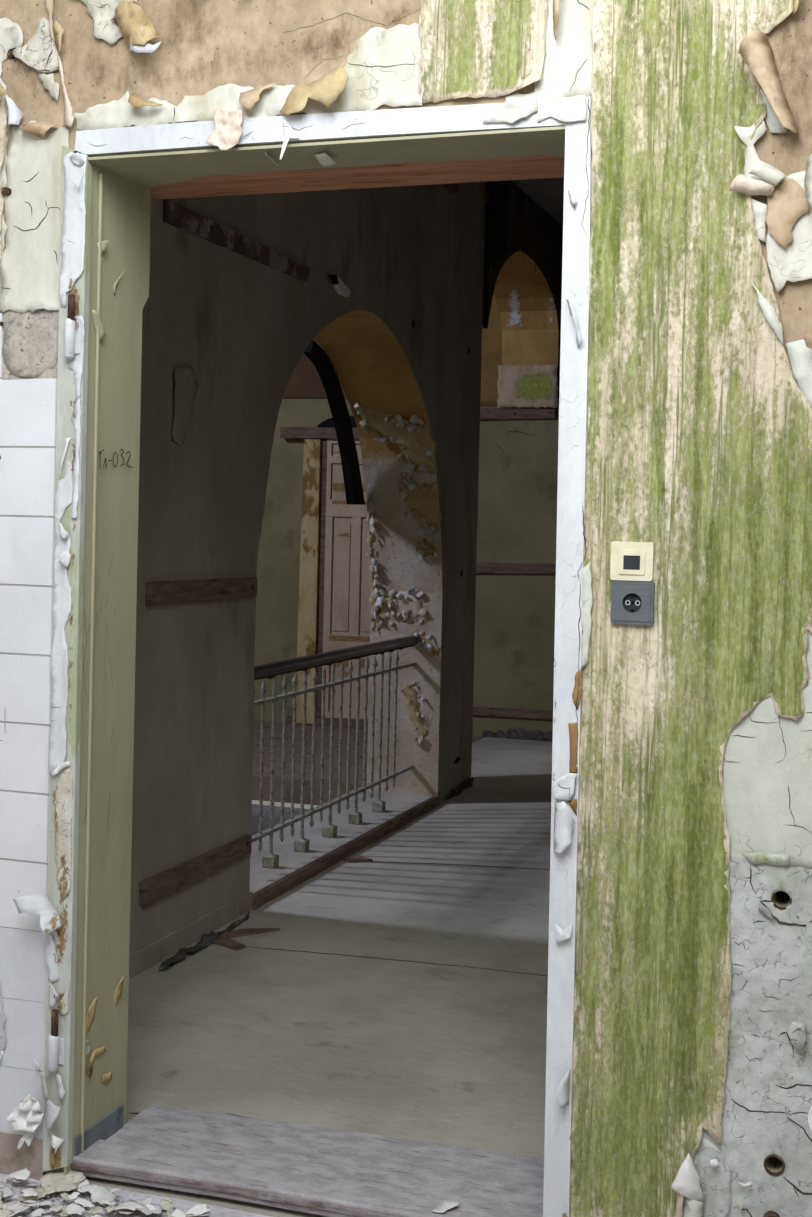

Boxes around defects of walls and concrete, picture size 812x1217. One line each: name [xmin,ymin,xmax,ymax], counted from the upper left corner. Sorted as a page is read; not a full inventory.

peeling [81,0,161,53]
peeling [482,0,594,124]
crack [15,172,61,259]
leakage [599,163,620,276]
peeling [729,89,812,408]
leakage [695,262,704,404]
peeling [0,17,428,1015]
leakage [691,455,716,701]
leakage [667,760,708,1089]
crack [734,865,812,967]
crack [732,1084,812,1142]
crack [783,1177,812,1197]